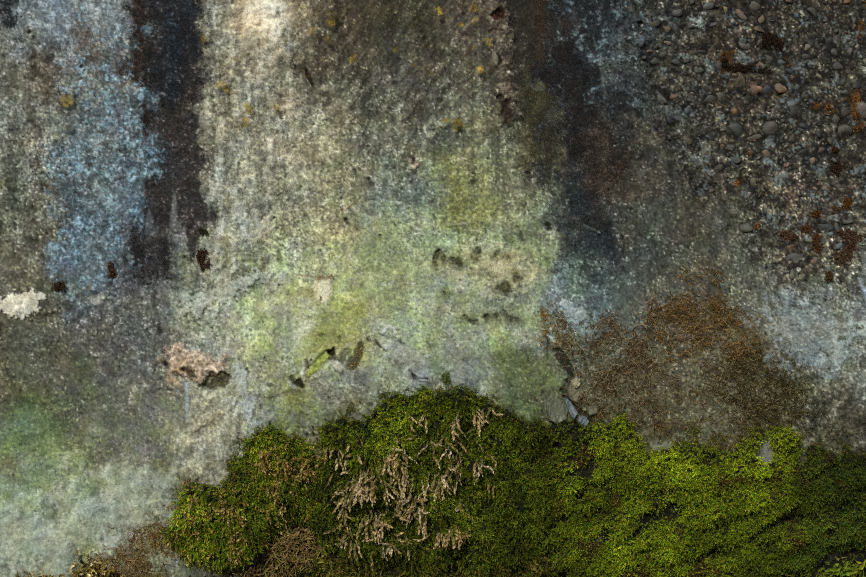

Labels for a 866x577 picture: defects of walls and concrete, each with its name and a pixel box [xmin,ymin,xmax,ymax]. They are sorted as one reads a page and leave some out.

leakage [0,0,302,438]
spalling [159,343,238,488]